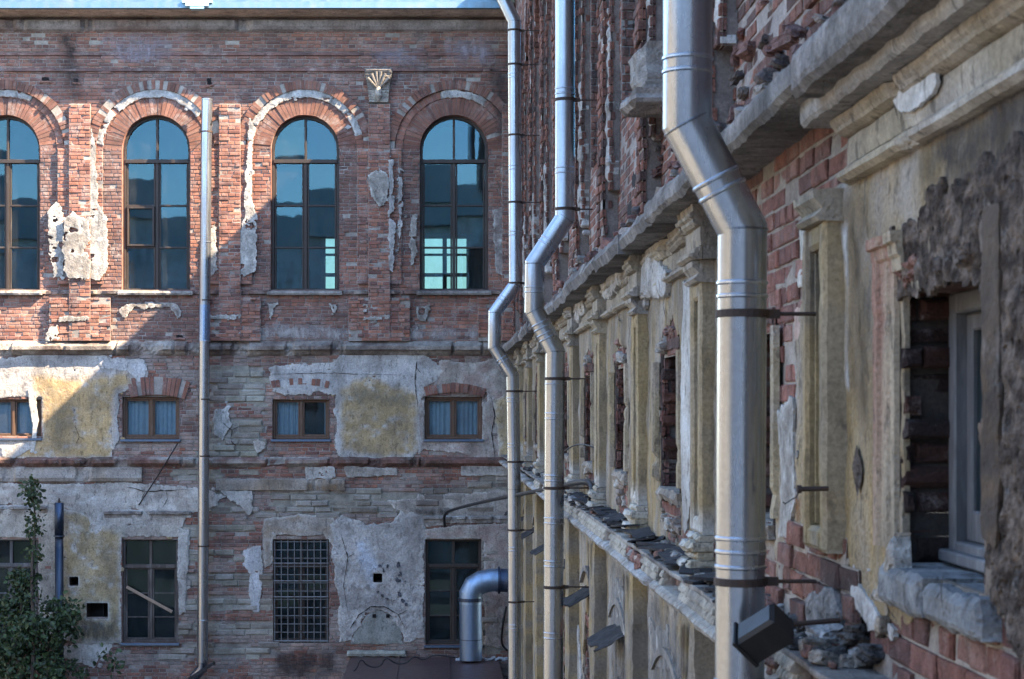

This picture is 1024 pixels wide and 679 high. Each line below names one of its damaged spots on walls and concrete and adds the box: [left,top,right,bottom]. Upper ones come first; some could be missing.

peeling [47,89,201,280]
peeling [239,89,362,277]
peeling [522,164,548,298]
peeling [577,82,590,236]
peeling [605,8,619,182]
peeling [893,73,940,112]
peeling [213,401,232,445]
flaking render [746,128,1024,679]